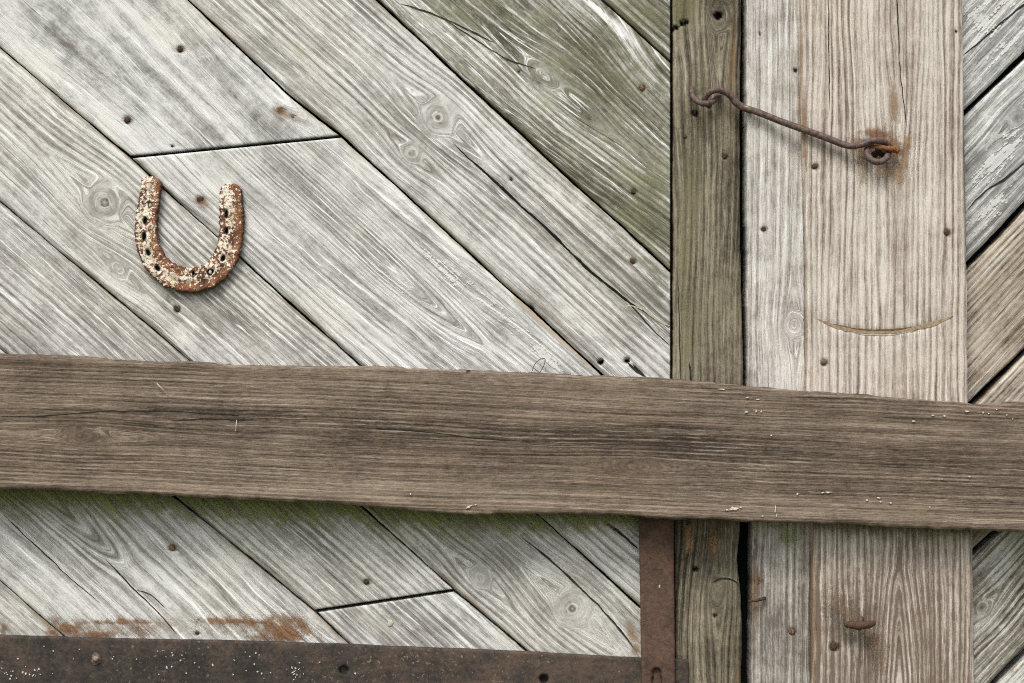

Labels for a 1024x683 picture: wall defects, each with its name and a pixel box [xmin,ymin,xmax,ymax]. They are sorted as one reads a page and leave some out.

rust [858,129,910,183]
rust [45,618,150,638]
rust [211,616,310,642]